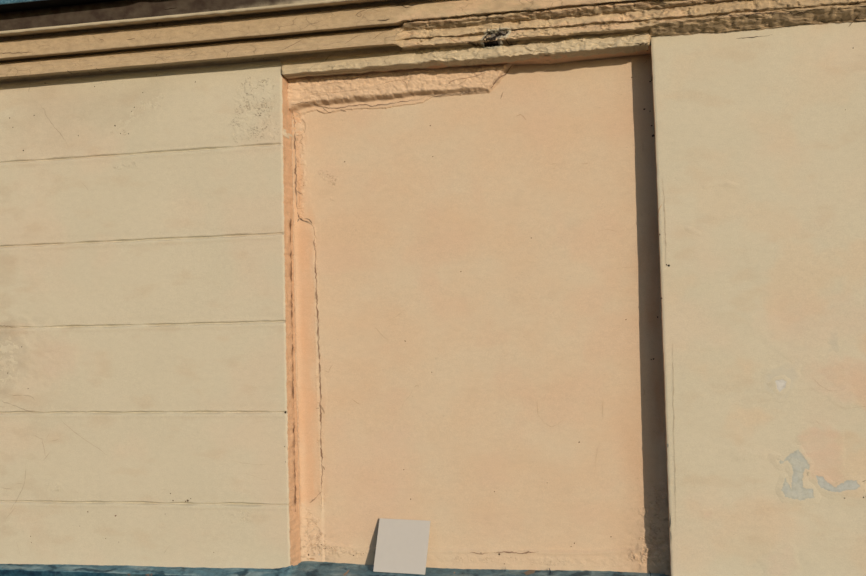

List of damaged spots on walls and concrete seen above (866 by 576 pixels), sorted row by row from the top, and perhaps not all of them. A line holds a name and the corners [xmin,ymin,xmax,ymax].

spalling [480,27,512,50]
crack [467,36,539,47]
crack [290,66,512,509]